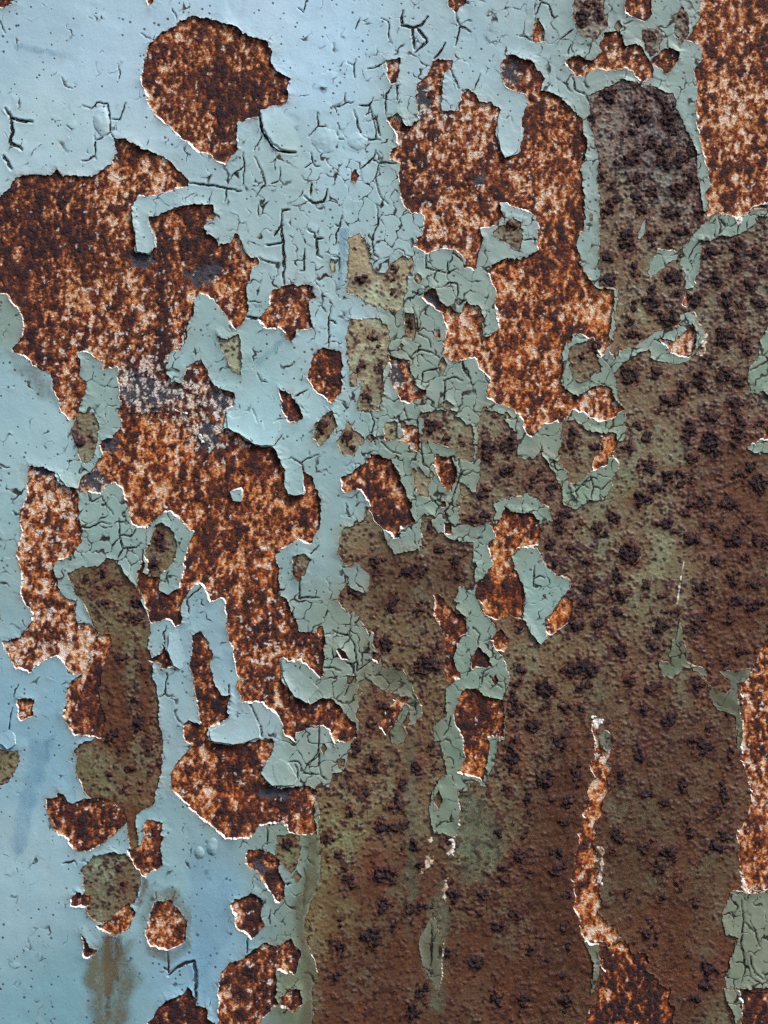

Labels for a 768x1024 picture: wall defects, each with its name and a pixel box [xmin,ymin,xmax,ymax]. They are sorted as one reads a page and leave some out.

corrosion [140,16,301,165]
crack [190,12,480,287]
crack [520,0,574,53]
peeling [217,334,242,375]
crack [410,257,471,405]
peeling [70,411,99,464]
peeling [143,510,195,595]
corrosion [0,138,409,1024]
peeling [230,487,243,502]
peeling [304,79,768,1024]
corrosion [340,0,768,1024]
crack [290,724,326,780]